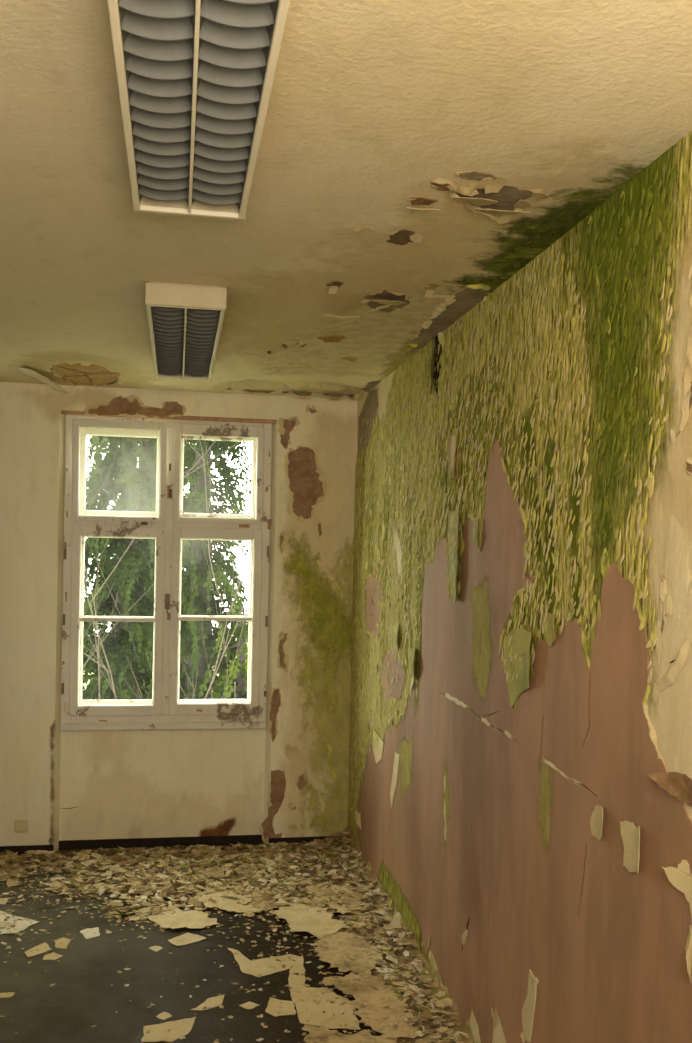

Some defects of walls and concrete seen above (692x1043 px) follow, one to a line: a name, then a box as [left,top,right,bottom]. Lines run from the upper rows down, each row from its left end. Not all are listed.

peeling [43,360,186,418]
spalling [361,290,411,313]
spalling [386,229,424,245]
peeling [405,283,492,399]
spalling [407,171,549,224]
damp [457,276,511,284]
peeling [212,379,381,543]
damp [522,408,555,613]
damp [569,461,582,624]
peeling [268,687,281,742]
peeling [325,440,692,1043]
peeling [260,744,311,842]